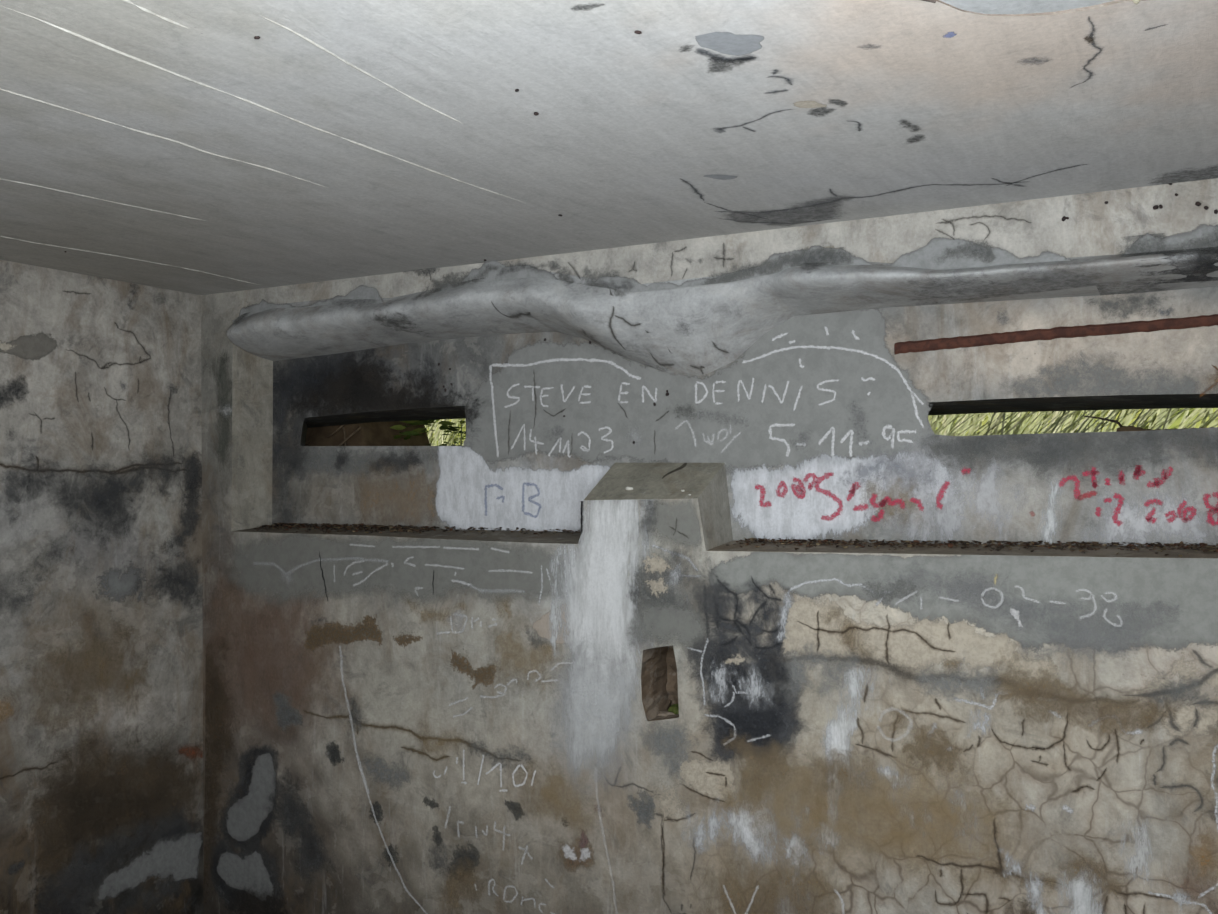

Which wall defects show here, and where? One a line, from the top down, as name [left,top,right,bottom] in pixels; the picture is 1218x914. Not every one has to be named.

spalling [680,32,764,72]
spalling [921,0,1146,16]
crack [1071,17,1102,88]
crack [671,164,1086,279]
flaking render [0,333,57,361]
water stain [6,453,203,608]
crack [304,699,531,767]
water stain [539,499,1178,914]
crack [782,647,1218,812]
water stain [505,769,583,827]
crack [919,819,1062,914]
water stain [1123,823,1218,914]